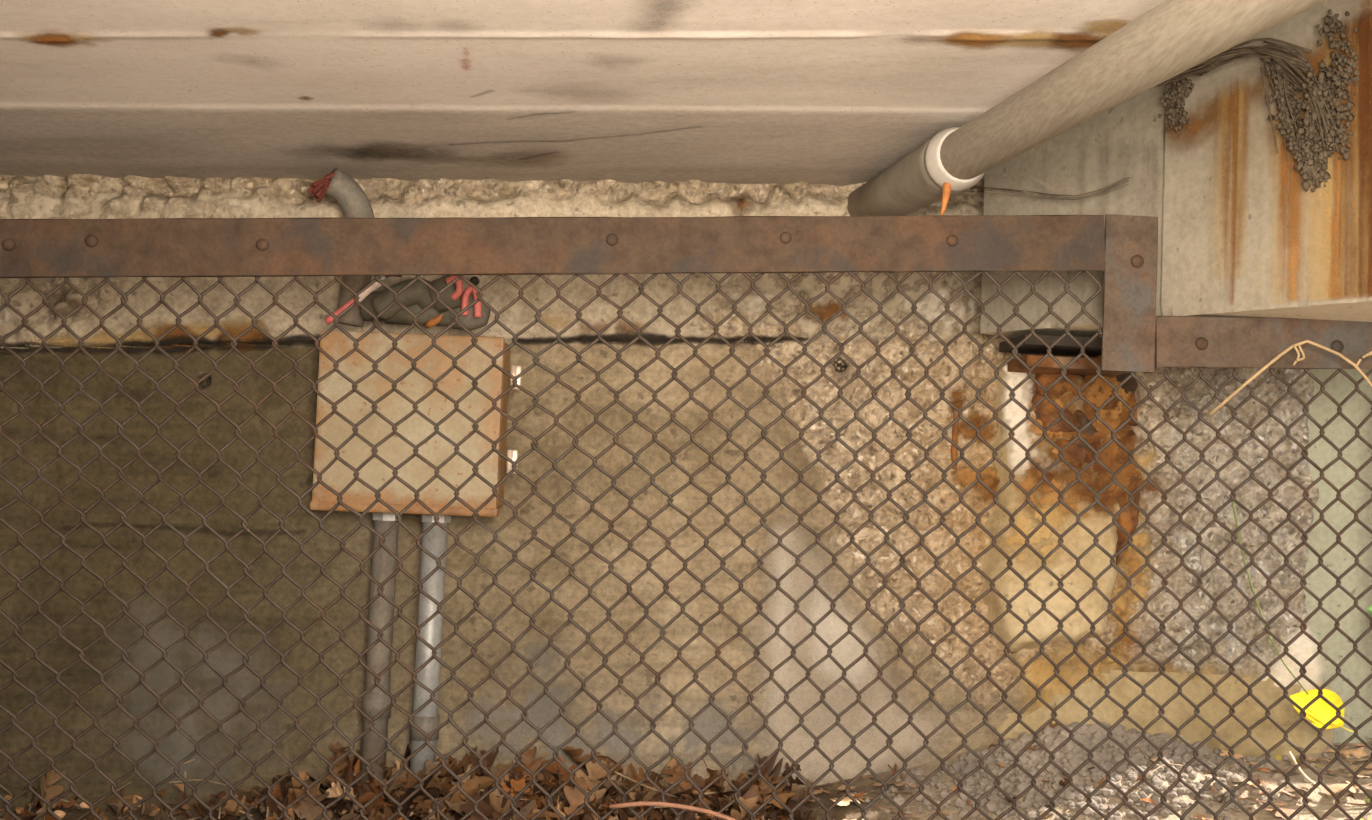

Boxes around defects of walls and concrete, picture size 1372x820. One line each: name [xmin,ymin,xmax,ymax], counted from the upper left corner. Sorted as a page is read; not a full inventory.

corrosion [28,34,89,45]
corrosion [211,29,255,37]
corrosion [947,21,1126,50]
corrosion [1220,87,1247,298]
corrosion [1279,15,1372,300]
corrosion [950,373,1161,657]